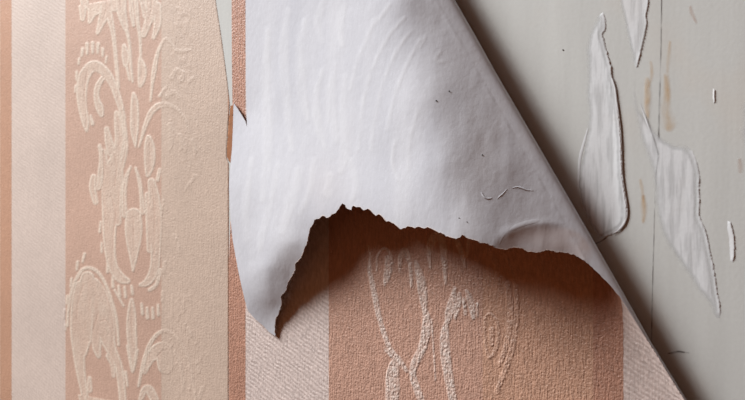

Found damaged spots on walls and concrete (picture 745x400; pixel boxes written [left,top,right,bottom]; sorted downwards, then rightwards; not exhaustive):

flaking render [577,12,628,238]
flaking render [621,0,649,69]
flaking render [639,104,721,317]
flaking render [727,221,735,262]